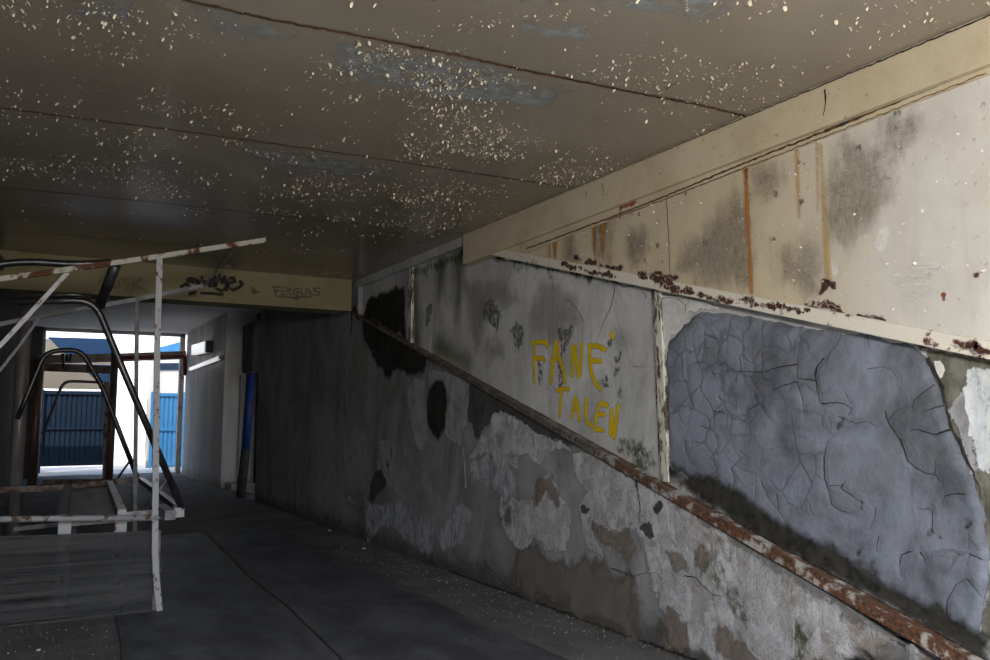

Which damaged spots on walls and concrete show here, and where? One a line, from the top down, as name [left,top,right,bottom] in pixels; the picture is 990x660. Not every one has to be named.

rust [743,168,753,293]
peeling [407,369,911,660]
crack [675,330,984,577]
peeling [934,361,945,379]
peeling [952,338,990,474]
crack [946,554,983,615]